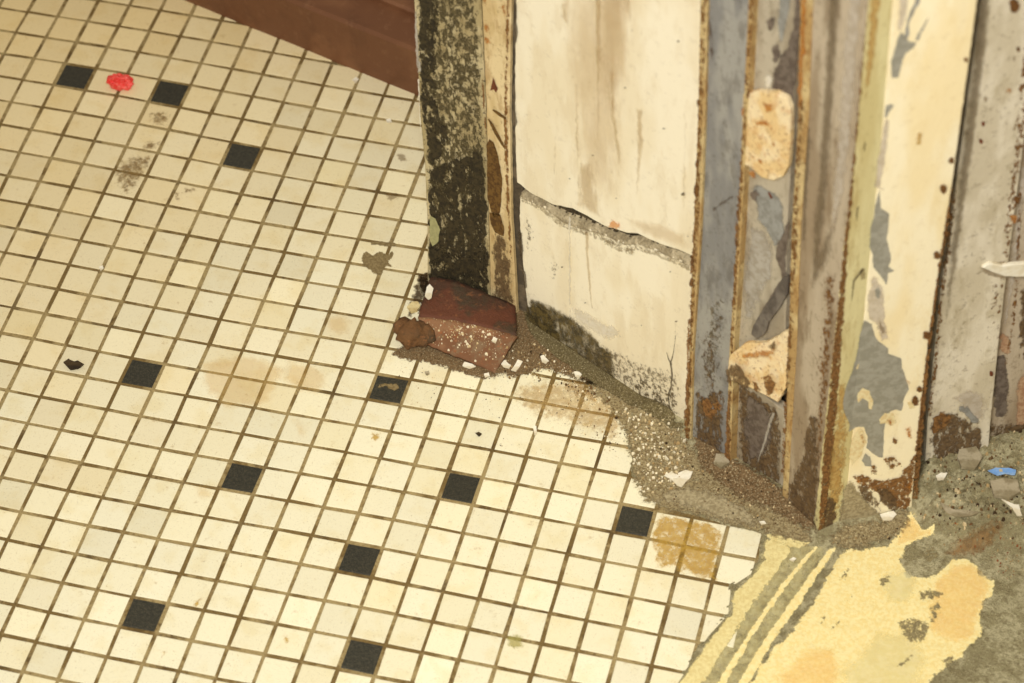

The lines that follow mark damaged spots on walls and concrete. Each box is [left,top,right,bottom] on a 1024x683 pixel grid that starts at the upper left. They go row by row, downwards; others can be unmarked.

corrosion [1009,0,1020,13]
mould [416,0,490,294]
peeling [501,360,523,372]
damp [526,217,679,412]
crack [520,189,692,267]
corrosion [684,0,867,531]
peeling [680,104,996,683]
corrosion [912,185,1024,499]
corrosion [1002,47,1024,263]
damp [653,517,721,578]